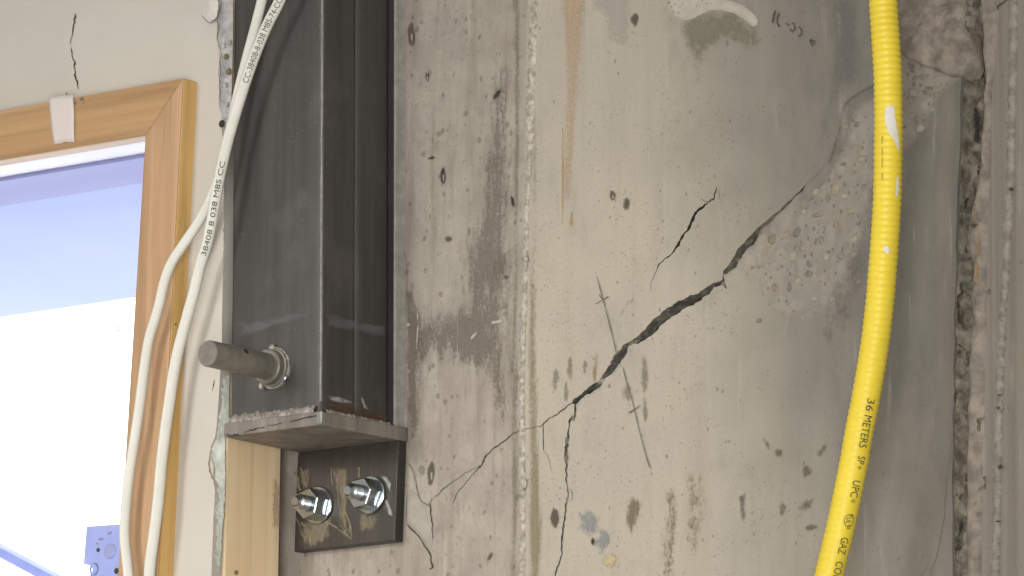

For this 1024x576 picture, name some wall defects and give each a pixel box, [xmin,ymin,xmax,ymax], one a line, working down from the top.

crack [66,14,79,95]
damp [407,88,518,437]
crack [433,187,727,576]
damp [686,15,755,54]
spalling [723,83,875,336]
spalling [897,0,1001,576]